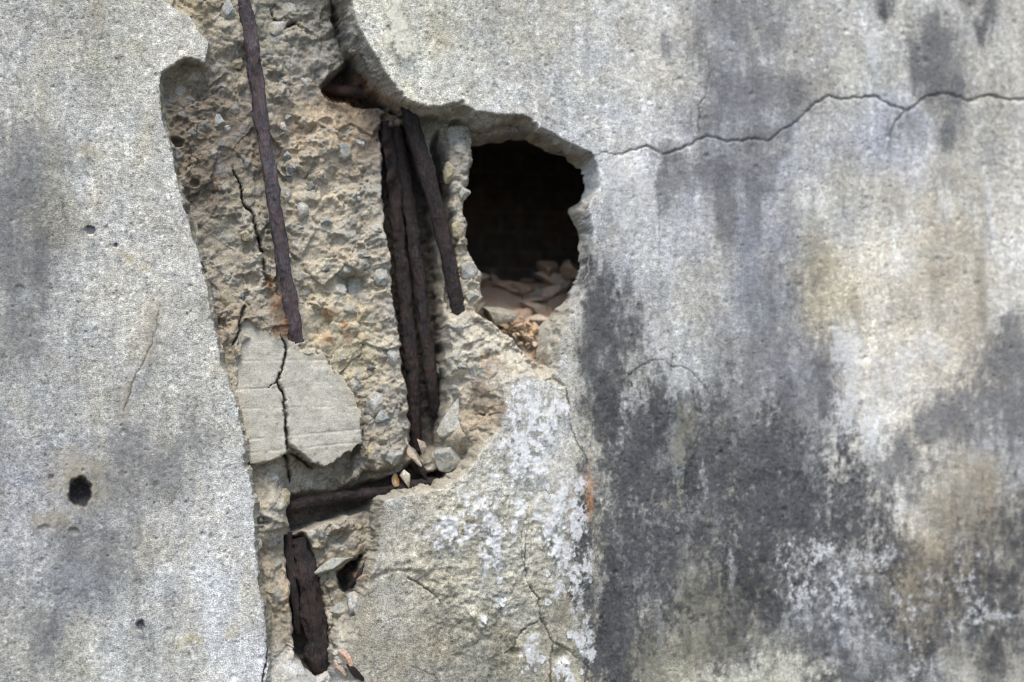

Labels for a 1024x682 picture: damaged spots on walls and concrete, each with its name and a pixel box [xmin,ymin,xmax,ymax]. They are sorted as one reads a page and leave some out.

leakage [604,0,816,255]
leakage [869,0,894,18]
leakage [898,5,967,149]
leakage [964,0,997,47]
crack [232,167,271,286]
rust [265,278,289,337]
crack [276,339,300,482]
spalling [159,0,597,682]
leakage [559,252,1024,682]